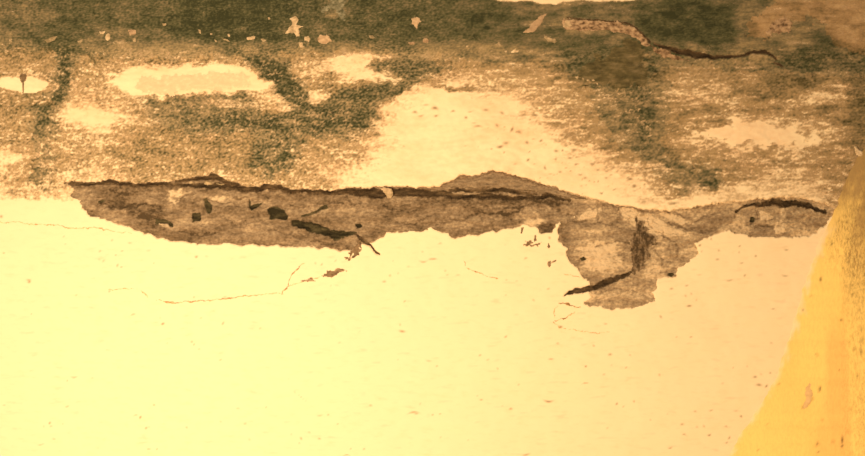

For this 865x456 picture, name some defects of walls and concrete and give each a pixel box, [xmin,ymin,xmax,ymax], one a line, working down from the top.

leakage [0,0,865,207]
crack [654,42,784,68]
spalling [68,170,835,310]
crack [735,199,826,214]